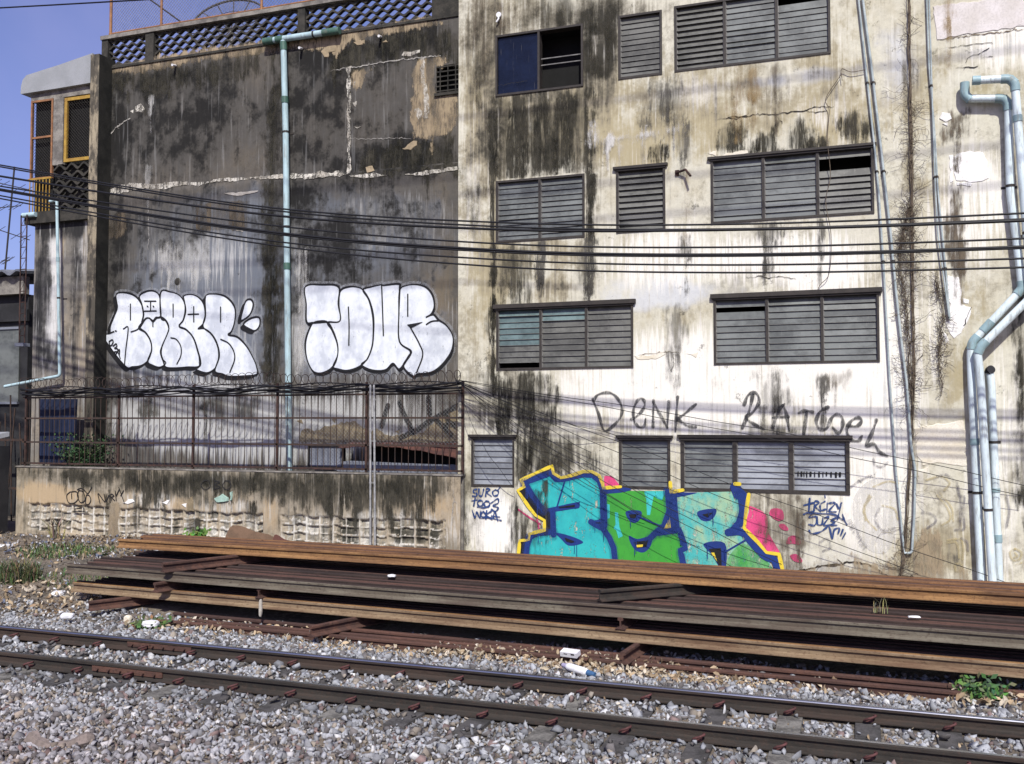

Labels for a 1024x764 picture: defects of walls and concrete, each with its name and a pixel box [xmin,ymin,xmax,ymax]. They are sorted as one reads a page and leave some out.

peeling [933,0,1024,40]
flaking render [393,50,458,151]
damp [716,119,827,153]
crack [717,106,834,122]
damp [836,111,875,144]
peeling [949,151,989,186]
damp [112,47,284,386]
damp [488,18,617,552]
damp [29,463,449,543]